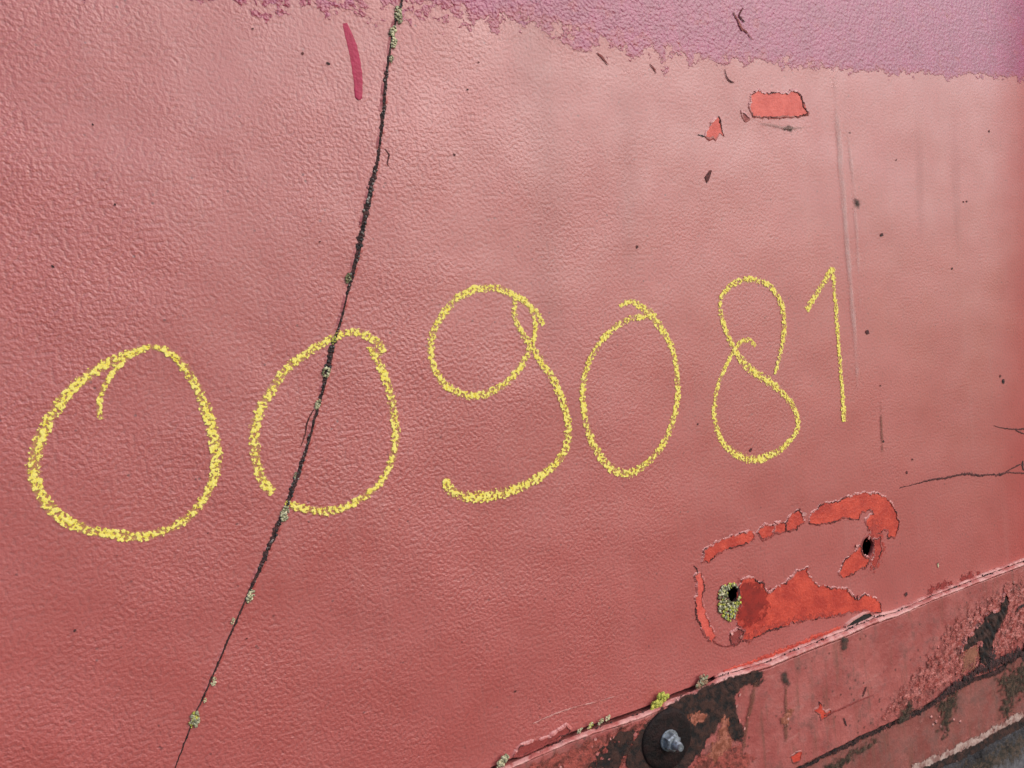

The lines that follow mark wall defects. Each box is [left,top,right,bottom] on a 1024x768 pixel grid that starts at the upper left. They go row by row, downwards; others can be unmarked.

peeling [698,116,725,141]
peeling [740,88,810,123]
crack [172,0,405,768]
crack [996,426,1024,434]
crack [900,461,1024,488]
peeling [693,491,900,672]
rust [960,591,1010,674]
rust [529,670,766,768]
rust [780,673,794,738]
rust [924,718,1024,768]